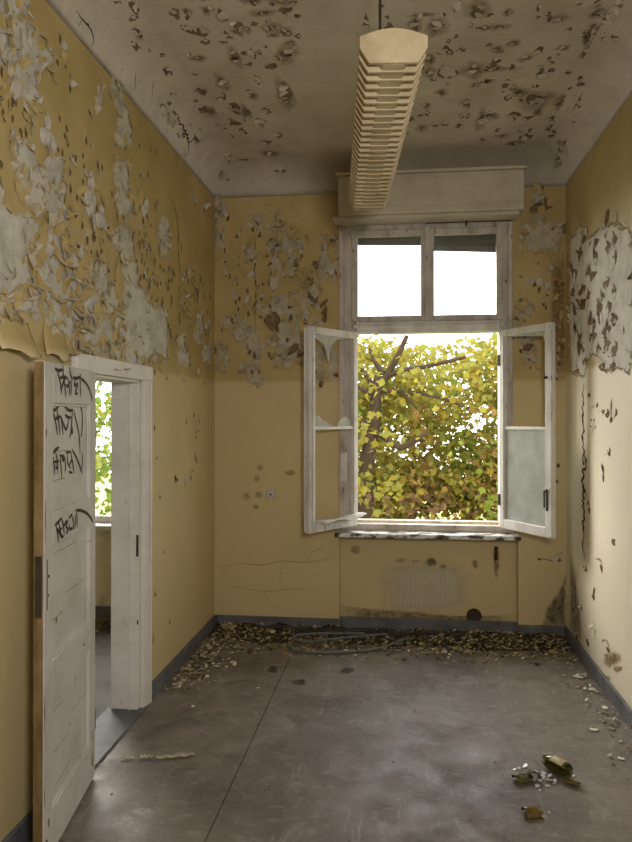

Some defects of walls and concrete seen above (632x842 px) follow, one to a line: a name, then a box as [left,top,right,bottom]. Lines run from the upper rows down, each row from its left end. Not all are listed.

peeling [407,0,504,33]
peeling [576,0,624,58]
peeling [404,34,585,164]
peeling [511,183,632,385]
peeling [588,393,618,431]